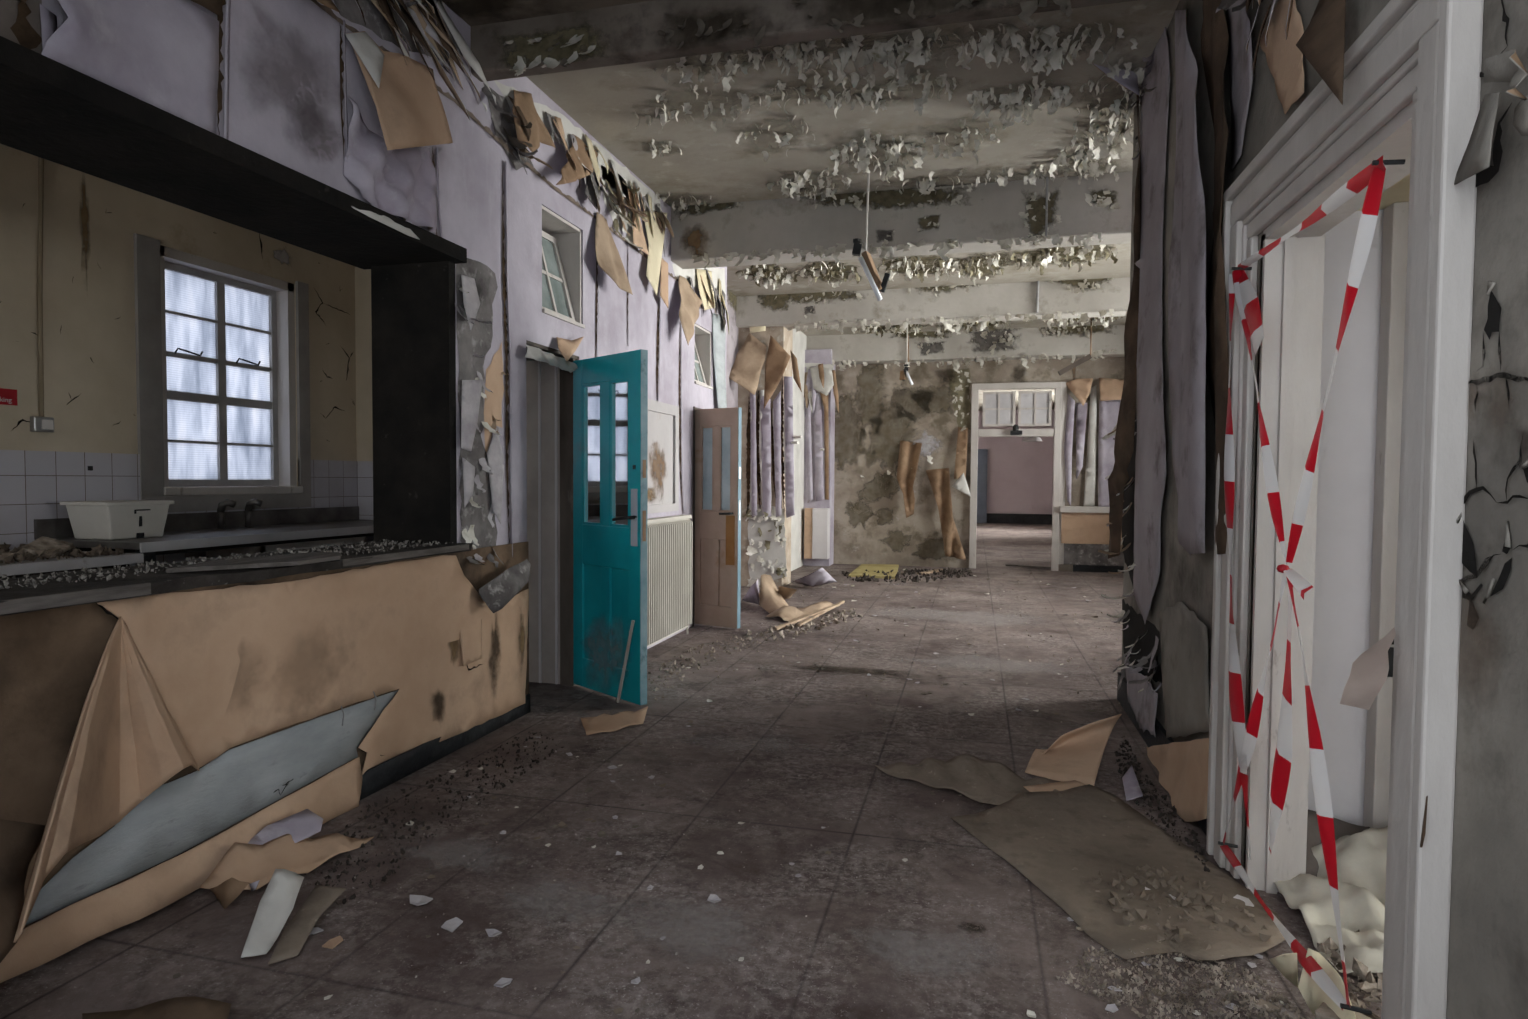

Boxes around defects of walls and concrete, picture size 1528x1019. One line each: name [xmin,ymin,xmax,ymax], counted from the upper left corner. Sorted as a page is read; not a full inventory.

peeling [0,258,531,983]
peeling [481,0,1346,822]
flaking render [1454,92,1501,185]
crack [1464,334,1528,504]